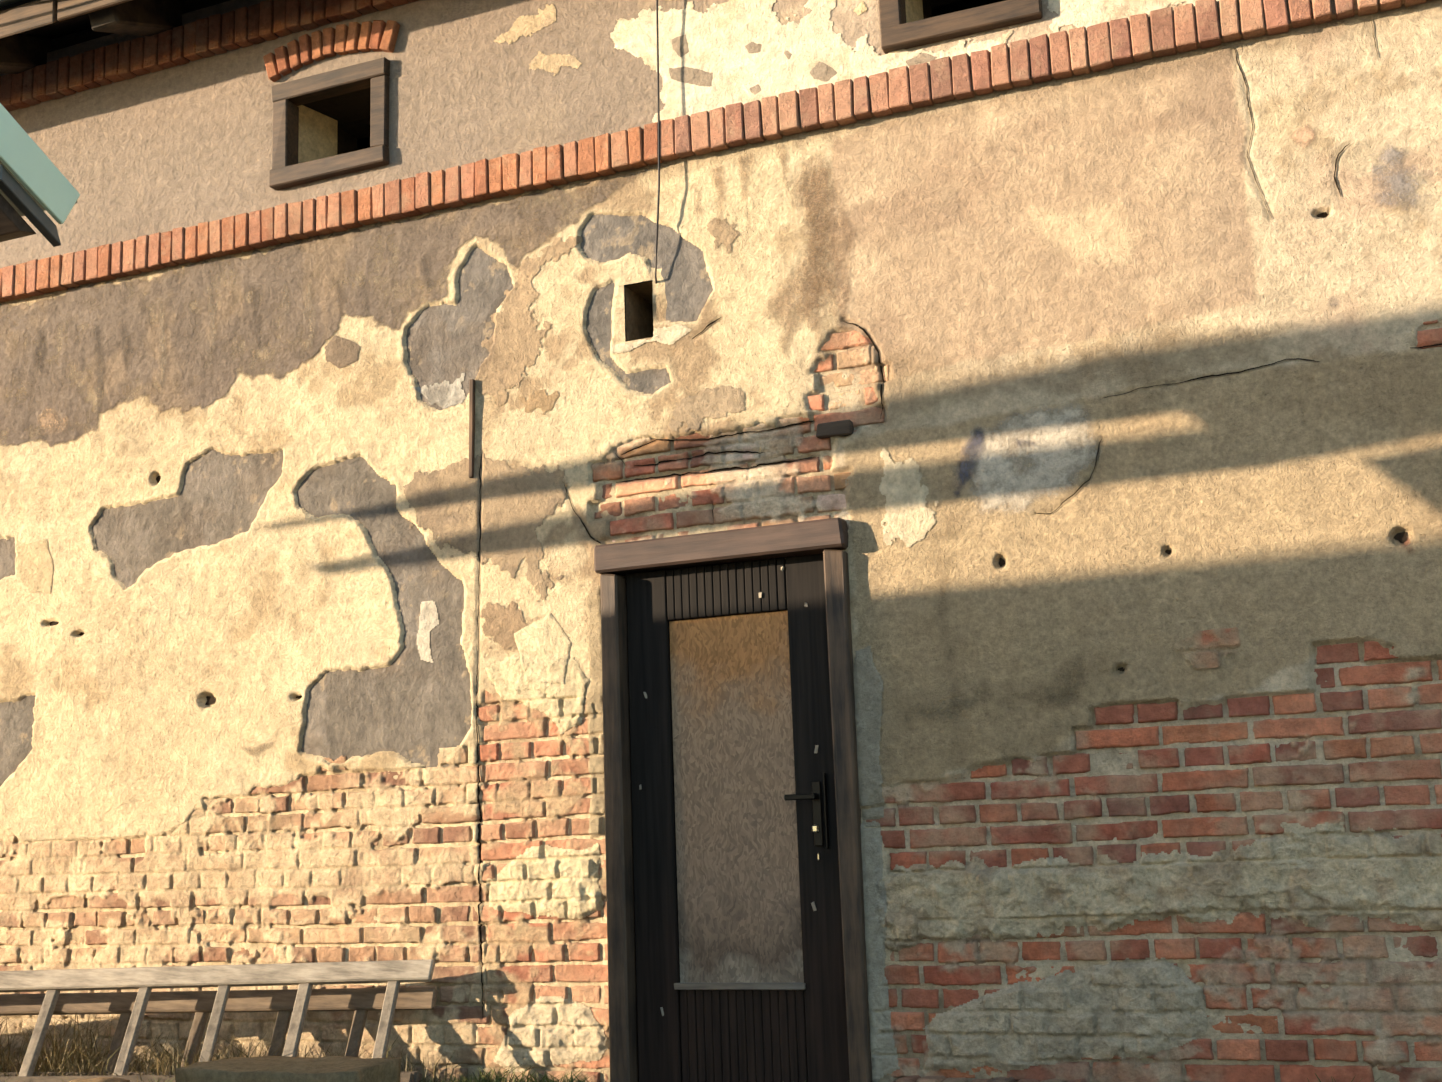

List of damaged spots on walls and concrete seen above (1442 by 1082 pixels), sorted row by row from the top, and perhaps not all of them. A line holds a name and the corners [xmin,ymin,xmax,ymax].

flaking render [610,0,1013,123]
crack [1234,49,1272,217]
flaking render [406,214,740,415]
flaking render [591,331,889,542]
flaking render [879,448,939,547]
spalling [1394,532,1407,543]
flaking render [0,449,610,1082]
flaking render [866,641,1442,870]
flaking render [884,908,1442,1082]